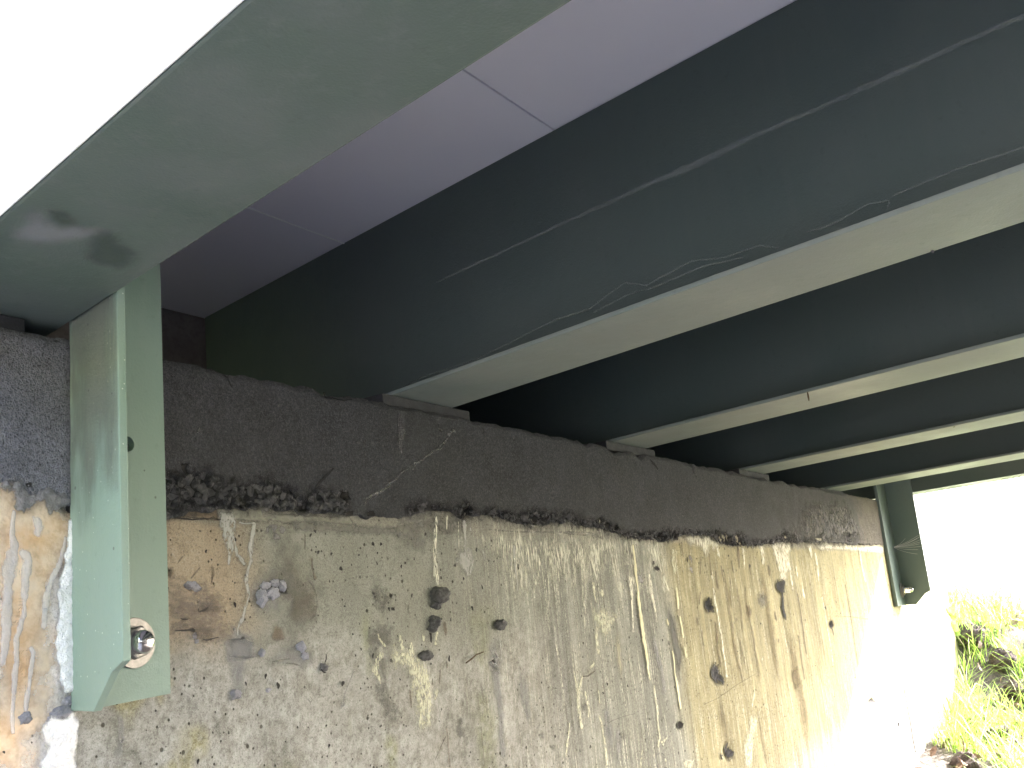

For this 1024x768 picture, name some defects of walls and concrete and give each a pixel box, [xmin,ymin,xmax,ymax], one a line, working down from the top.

spalling [165,463,355,555]
water stain [0,511,35,733]